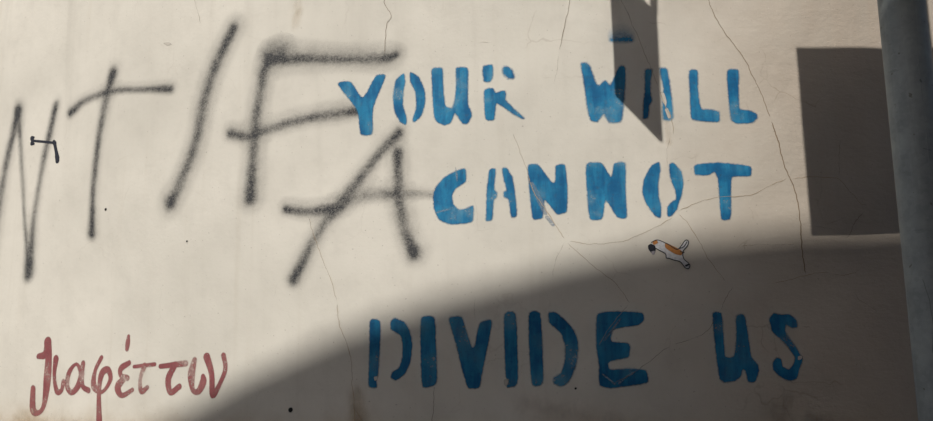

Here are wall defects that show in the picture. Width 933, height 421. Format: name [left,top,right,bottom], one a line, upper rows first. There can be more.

crack [513,2,805,382]